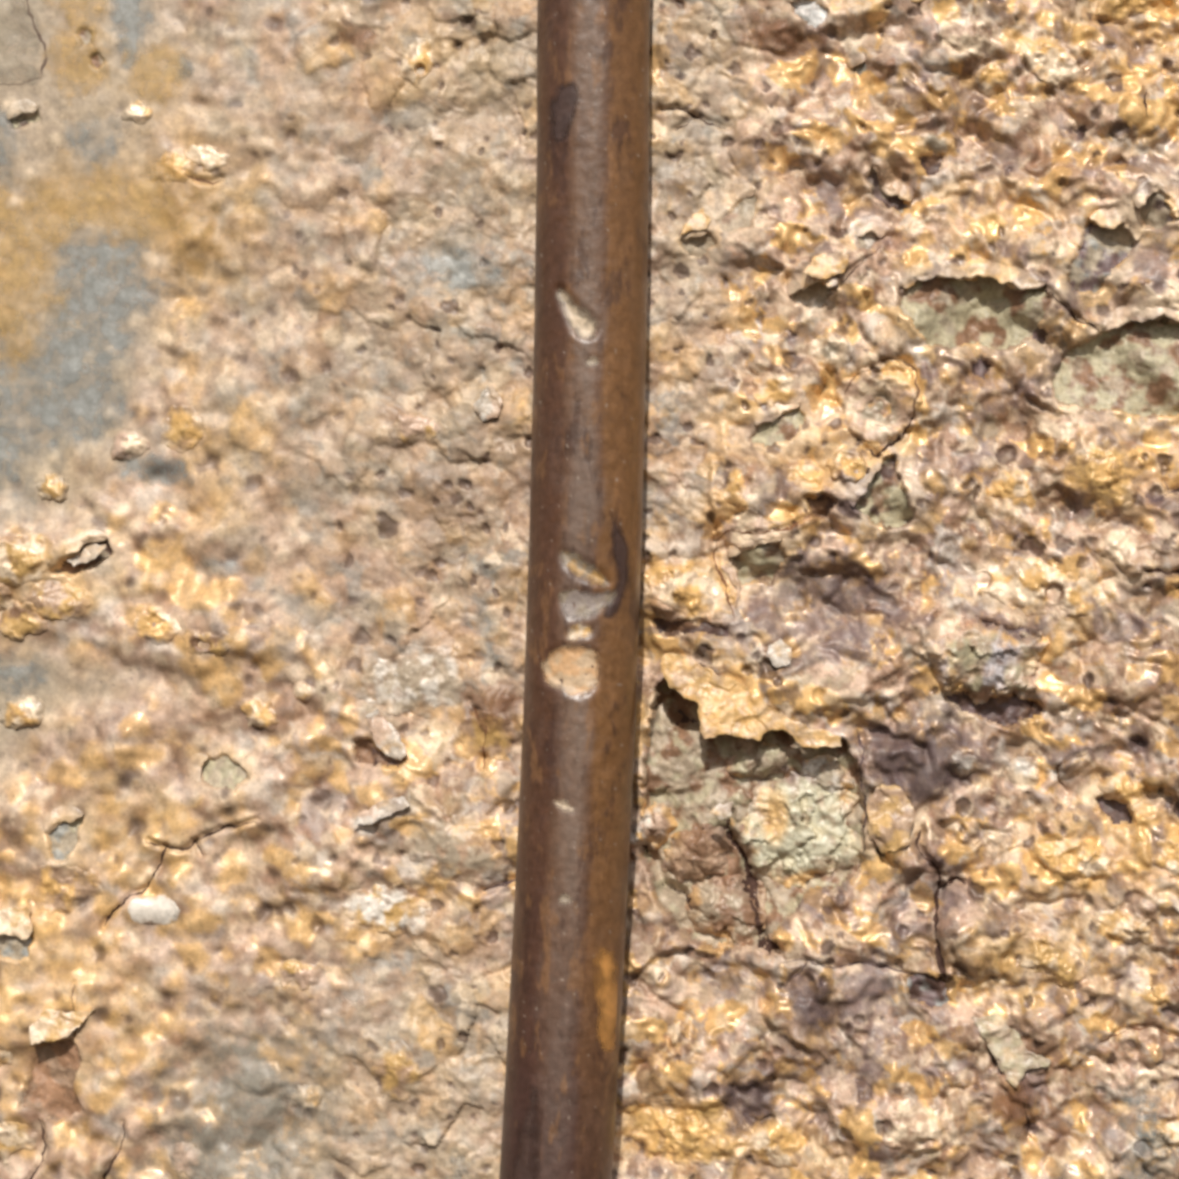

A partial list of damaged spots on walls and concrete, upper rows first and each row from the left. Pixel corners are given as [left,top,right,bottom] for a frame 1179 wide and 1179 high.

peeling [899,258,1050,379]
peeling [1053,305,1179,417]
spalling [643,653,915,949]
crack [723,818,966,989]
corrosion [598,951,618,1050]